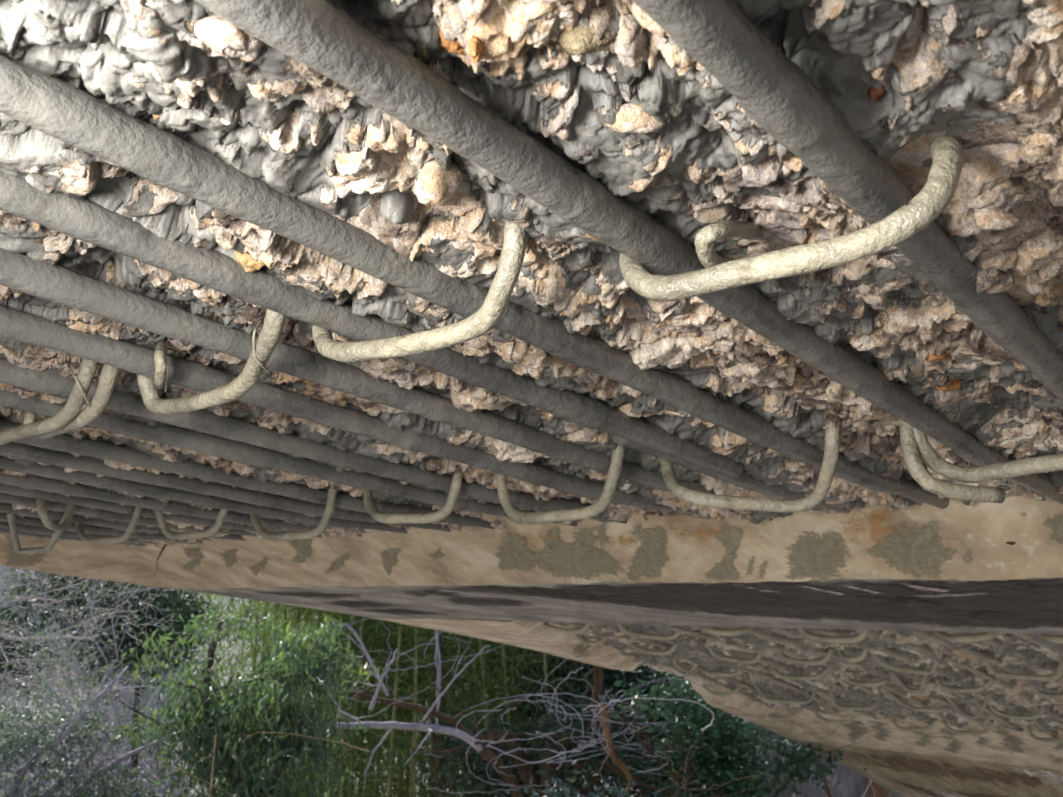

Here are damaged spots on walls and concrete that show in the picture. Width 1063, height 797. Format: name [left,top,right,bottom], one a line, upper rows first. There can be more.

spalling [0,0,985,548]
spalling [733,0,1063,352]
spalling [750,246,1063,460]
spalling [922,461,1047,501]
spalling [1038,470,1063,494]
spalling [551,622,1063,739]